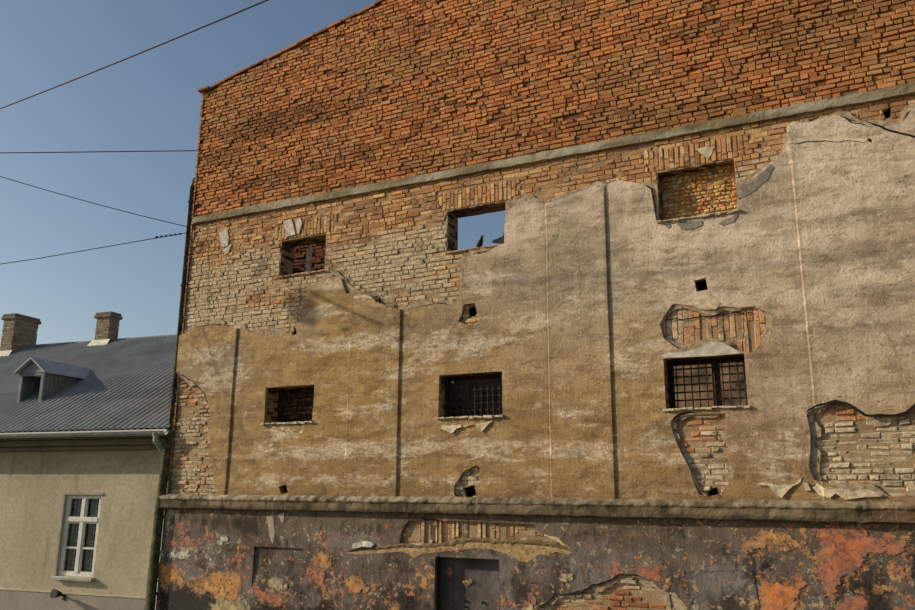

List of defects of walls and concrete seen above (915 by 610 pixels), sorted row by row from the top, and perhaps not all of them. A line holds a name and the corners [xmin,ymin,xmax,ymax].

crack [791,116,915,144]
spalling [183,95,915,335]
spalling [660,304,773,353]
spalling [671,414,734,496]
spalling [758,402,915,500]
leakage [267,513,284,543]
peeling [346,520,573,562]
leakage [159,586,216,610]
leakage [390,589,412,610]
crack [535,573,642,609]
spalling [495,565,688,610]
mould [841,581,890,610]